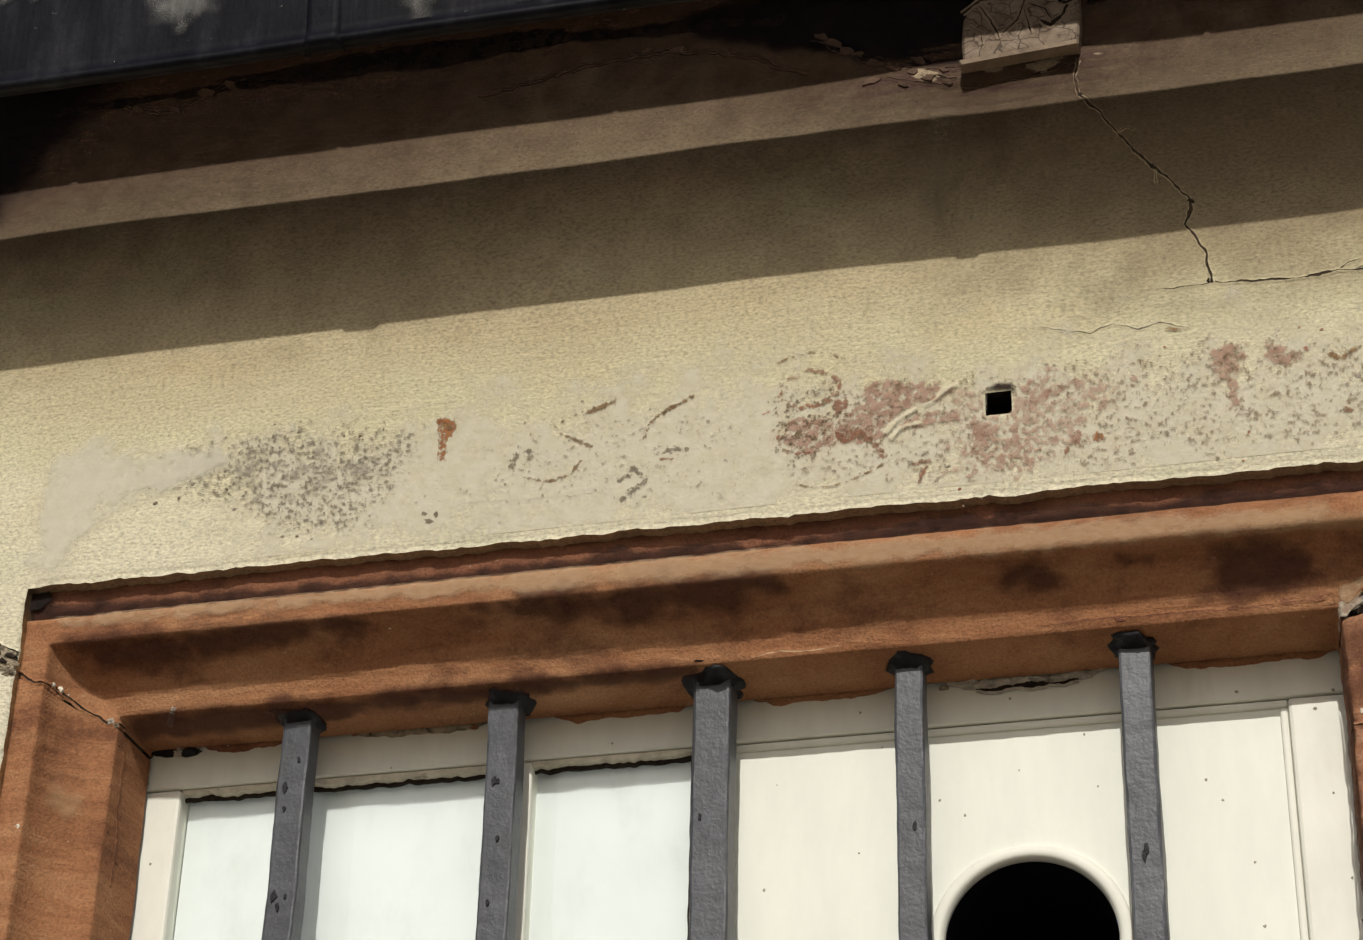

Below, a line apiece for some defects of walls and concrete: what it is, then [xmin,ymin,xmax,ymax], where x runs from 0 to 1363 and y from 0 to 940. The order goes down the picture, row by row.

flaking render [810,33,958,88]
damp [1057,0,1304,74]
damp [0,0,963,222]
crack [1040,58,1363,336]
peeling [757,328,1363,506]
peeling [459,400,744,524]
damp [506,568,785,624]
damp [1208,540,1312,602]
spalling [1337,576,1363,632]
flaking render [0,641,20,677]
crack [19,668,126,732]